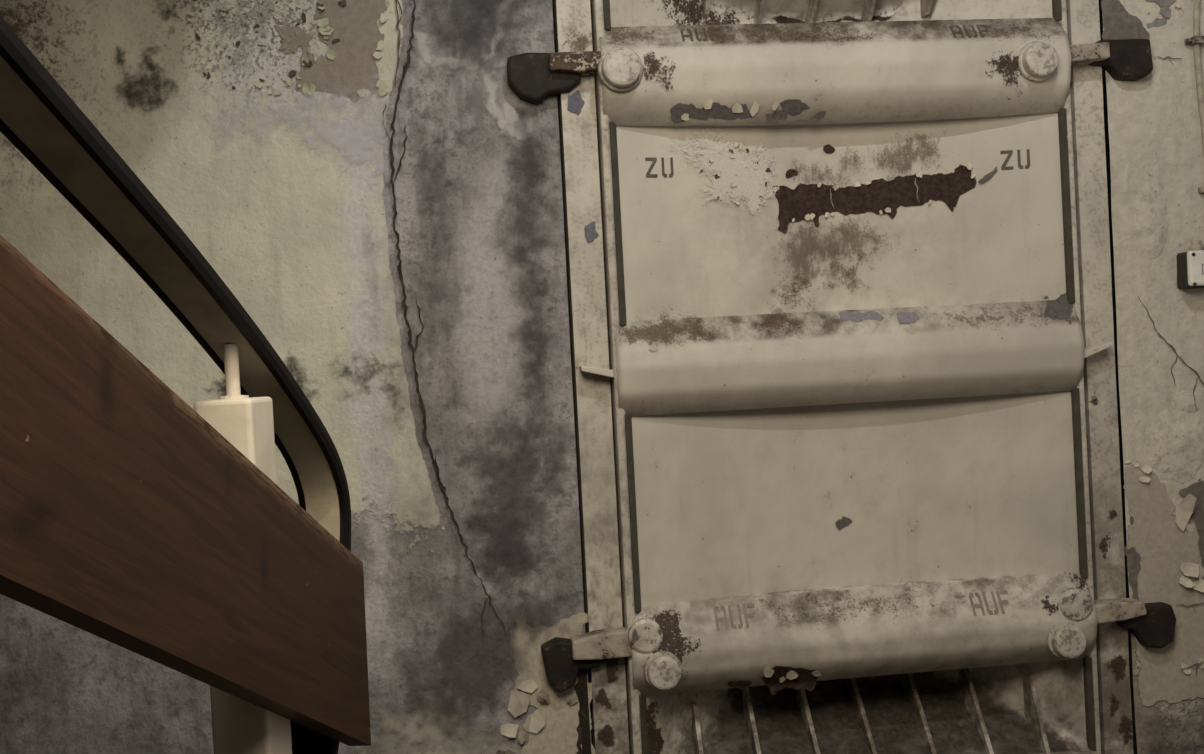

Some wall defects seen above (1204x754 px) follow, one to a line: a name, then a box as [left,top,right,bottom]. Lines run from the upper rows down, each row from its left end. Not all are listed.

water stain [117,48,174,109]
peeling [182,0,389,102]
peeling [1101,0,1182,40]
water stain [415,0,542,310]
crack [382,0,506,635]
rust [619,314,714,352]
rust [756,213,881,334]
crack [1138,296,1204,409]
water stain [471,439,545,574]
peeling [1124,459,1204,707]
peeling [496,612,595,754]
rust [641,610,703,681]